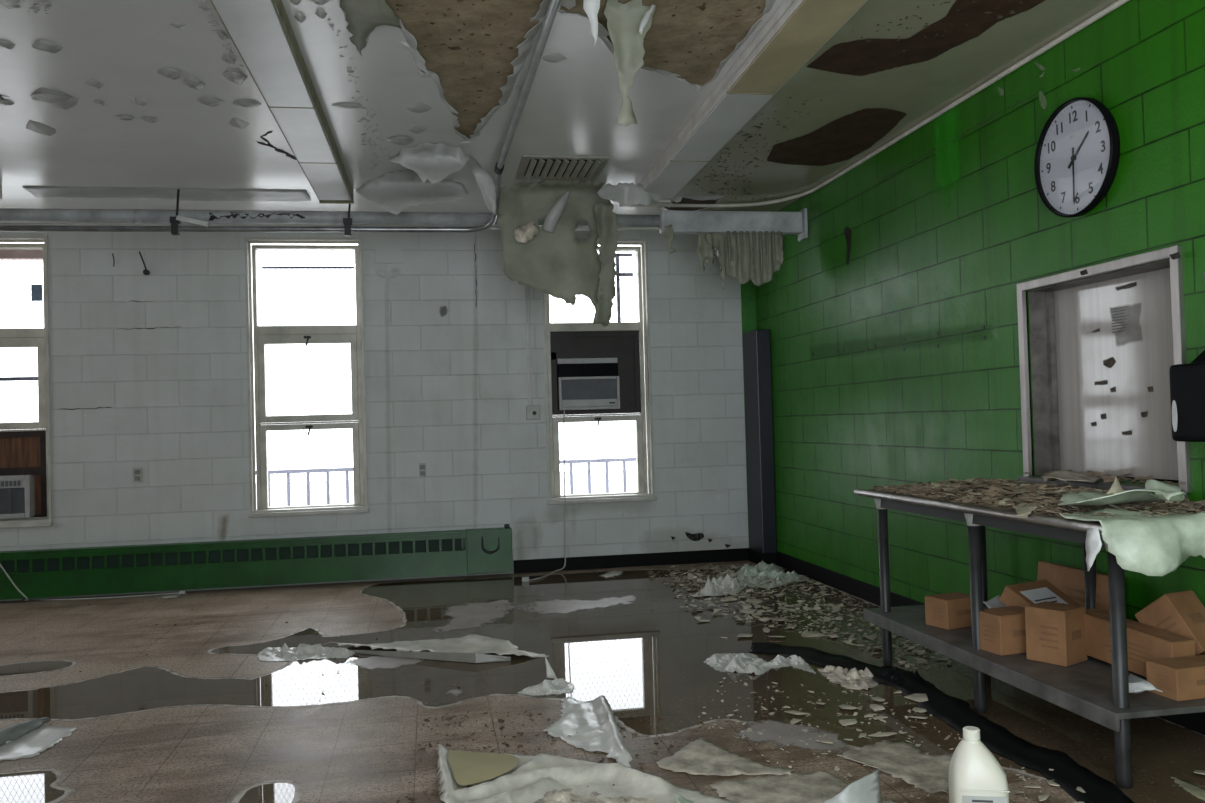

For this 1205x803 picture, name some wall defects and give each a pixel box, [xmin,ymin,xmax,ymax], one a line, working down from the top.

peeling [328,0,776,169]
peeling [807,0,1045,76]
peeling [660,97,907,211]